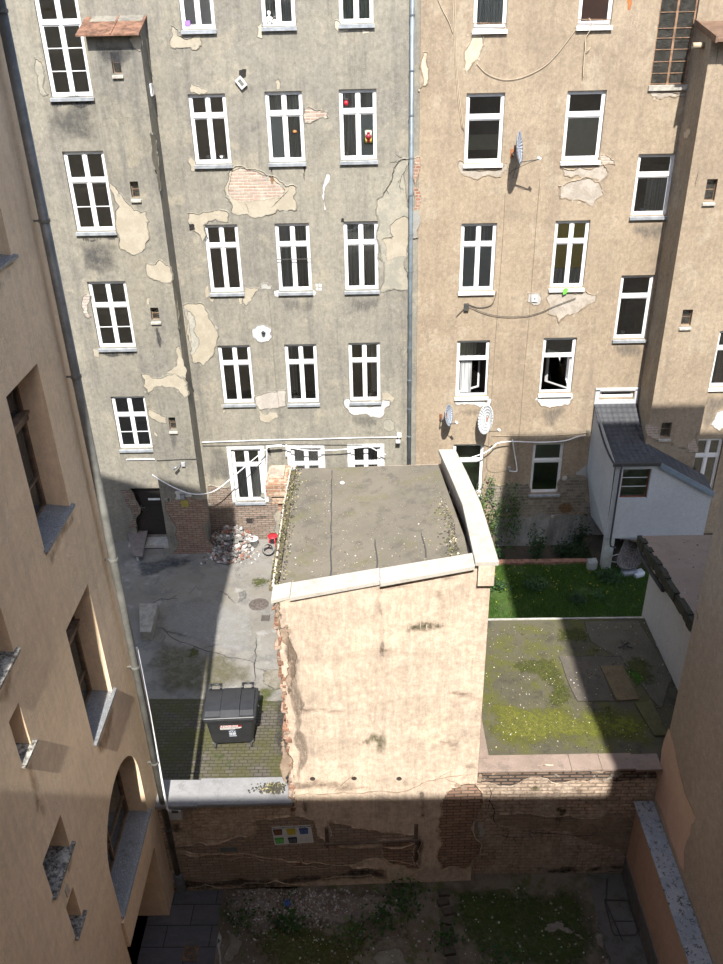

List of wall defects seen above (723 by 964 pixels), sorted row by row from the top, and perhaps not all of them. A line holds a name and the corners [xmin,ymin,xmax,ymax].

peeling [169,25,203,51]
peeling [108,182,174,284]
peeling [187,165,298,243]
peeling [375,155,423,293]
peeling [558,154,615,207]
peeling [526,291,598,325]
peeling [141,284,220,436]
spalling [275,602,297,695]
spalling [279,735,294,786]
flaking render [168,822,422,890]
flaking render [435,764,659,870]